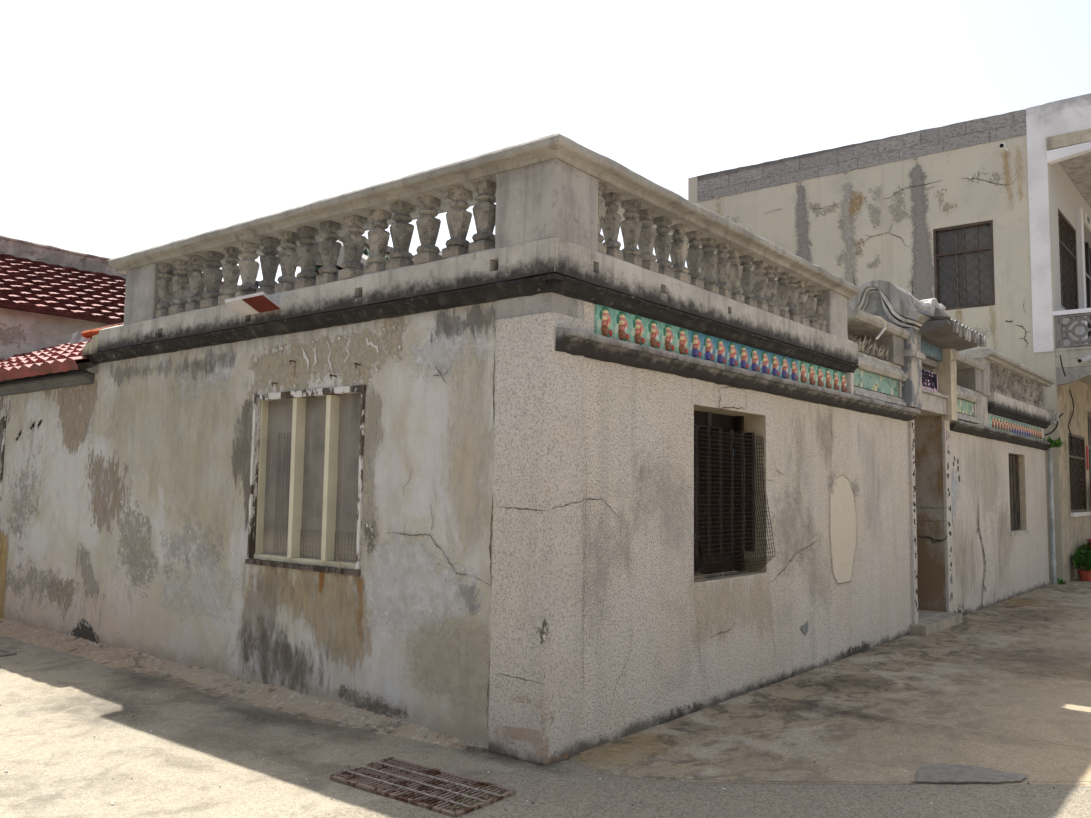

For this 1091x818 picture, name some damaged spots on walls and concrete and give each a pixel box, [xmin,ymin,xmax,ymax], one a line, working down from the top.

crack [866,178,1014,247]
peeling [0,395,43,441]
peeling [0,544,106,644]
peeling [42,378,225,598]
leakage [231,392,258,530]
leakage [239,386,468,718]
crack [490,354,498,421]
crack [387,461,634,730]
crack [908,507,949,544]
crack [962,502,1003,603]